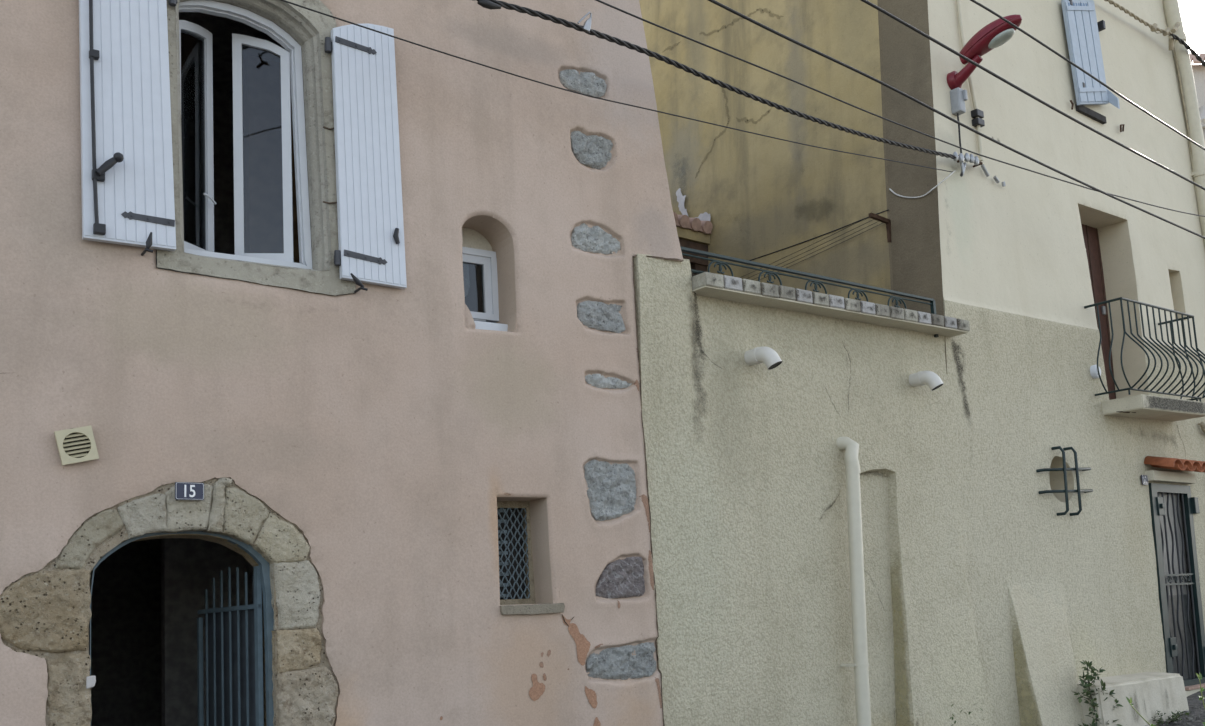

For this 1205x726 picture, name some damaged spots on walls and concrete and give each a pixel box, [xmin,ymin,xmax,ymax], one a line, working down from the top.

water stain [952,342,970,415]
flaking render [529,650,551,701]
flaking render [562,616,662,726]